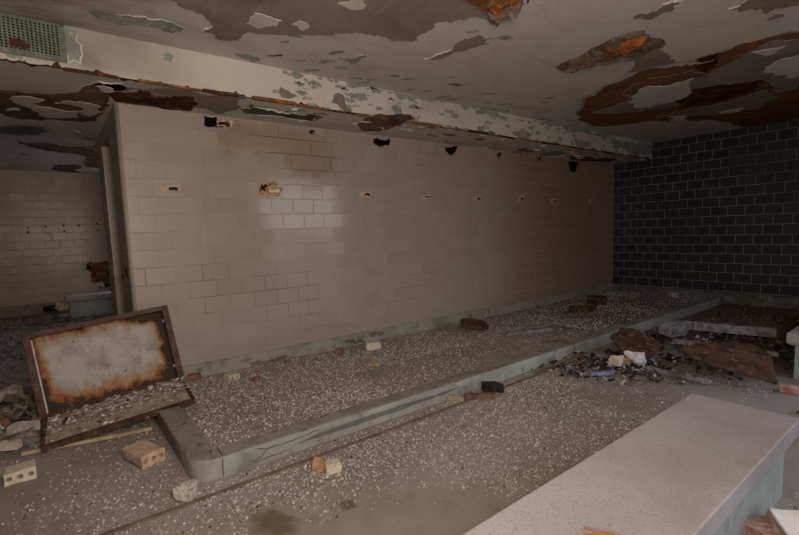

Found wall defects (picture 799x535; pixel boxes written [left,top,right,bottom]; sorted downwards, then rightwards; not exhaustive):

peeling [632,0,684,20]
peeling [725,0,799,21]
peeling [172,0,503,61]
spalling [575,31,799,127]
peeling [0,80,328,134]
peeling [331,93,458,156]
spalling [14,140,99,173]
peeling [474,134,625,173]
spalling [256,180,283,198]
crack [252,427,328,462]